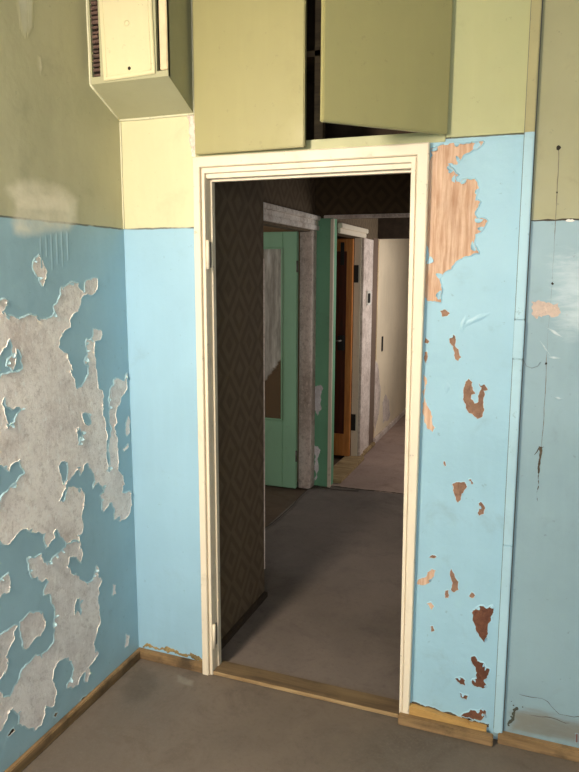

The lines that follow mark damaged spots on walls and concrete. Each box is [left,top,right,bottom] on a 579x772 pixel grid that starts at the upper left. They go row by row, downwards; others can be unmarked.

peeling [425,140,489,318]
flaking render [532,300,561,319]
peeling [448,334,462,362]
peeling [421,336,436,433]
peeling [462,378,489,420]
peeling [0,277,132,738]
peeling [452,478,474,503]
peeling [477,501,486,517]
peeling [416,554,437,586]
peeling [444,568,459,599]
peeling [468,591,495,643]
peeling [410,655,491,728]